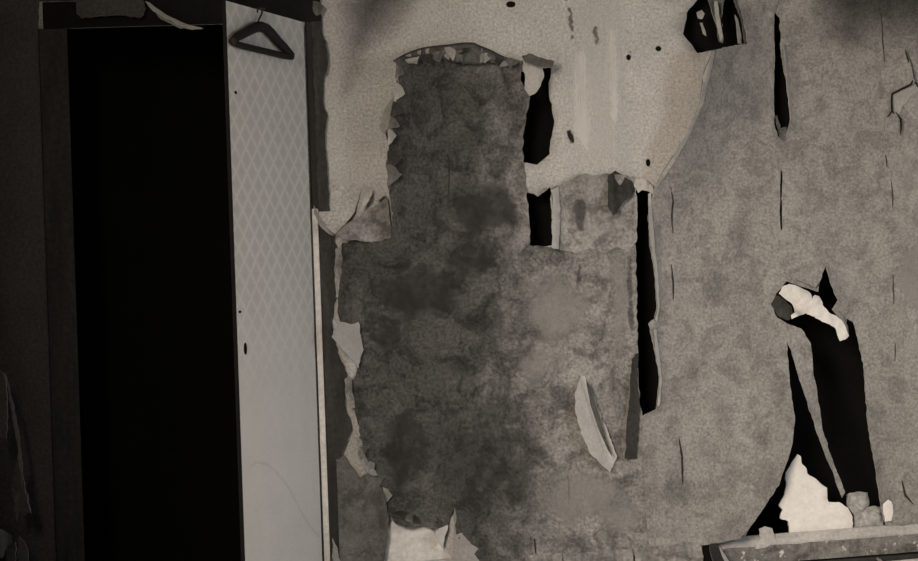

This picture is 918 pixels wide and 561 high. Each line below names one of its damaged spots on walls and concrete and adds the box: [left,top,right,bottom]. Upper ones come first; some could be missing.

spalling [683,0,747,53]
spalling [774,13,790,138]
spalling [521,53,554,165]
peeling [318,183,391,242]
spalling [526,187,552,247]
leakage [575,200,585,230]
spalling [635,190,659,415]
peeling [332,322,364,368]
peeling [575,375,617,472]
spalling [746,267,881,549]
flaking render [385,507,479,561]